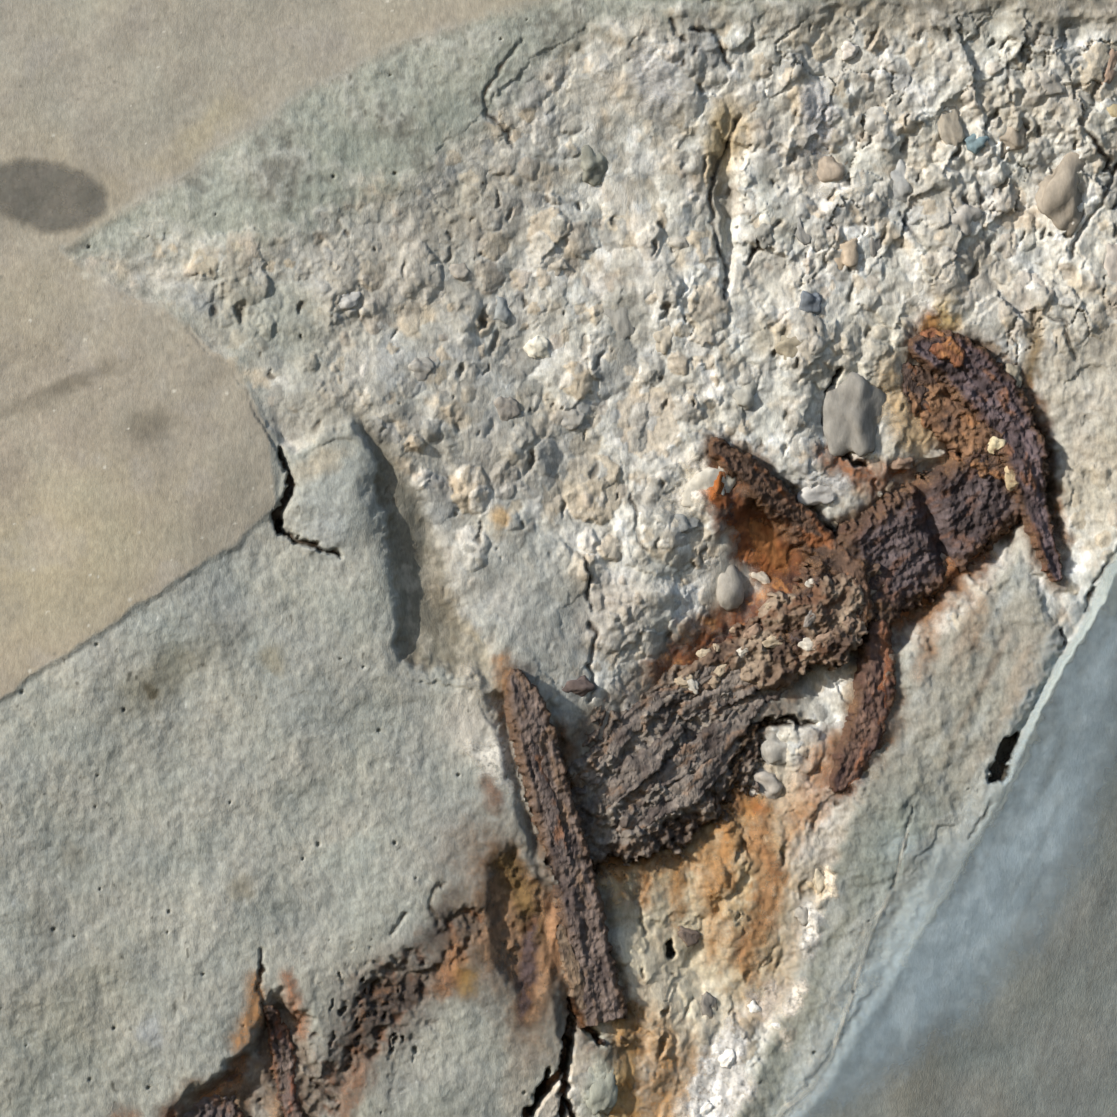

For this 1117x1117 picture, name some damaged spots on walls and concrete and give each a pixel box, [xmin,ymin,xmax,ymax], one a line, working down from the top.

water stain [0,161,104,230]
crack [271,448,339,556]
corrosion [647,459,808,681]
spalling [833,447,1021,624]
spalling [901,328,1065,587]
corrosion [1027,354,1066,545]
spalling [565,664,798,867]
corrosion [347,841,562,1049]
spalling [500,668,628,1117]
corrosion [596,784,817,990]
spalling [172,987,330,1117]
crack [522,996,603,1117]